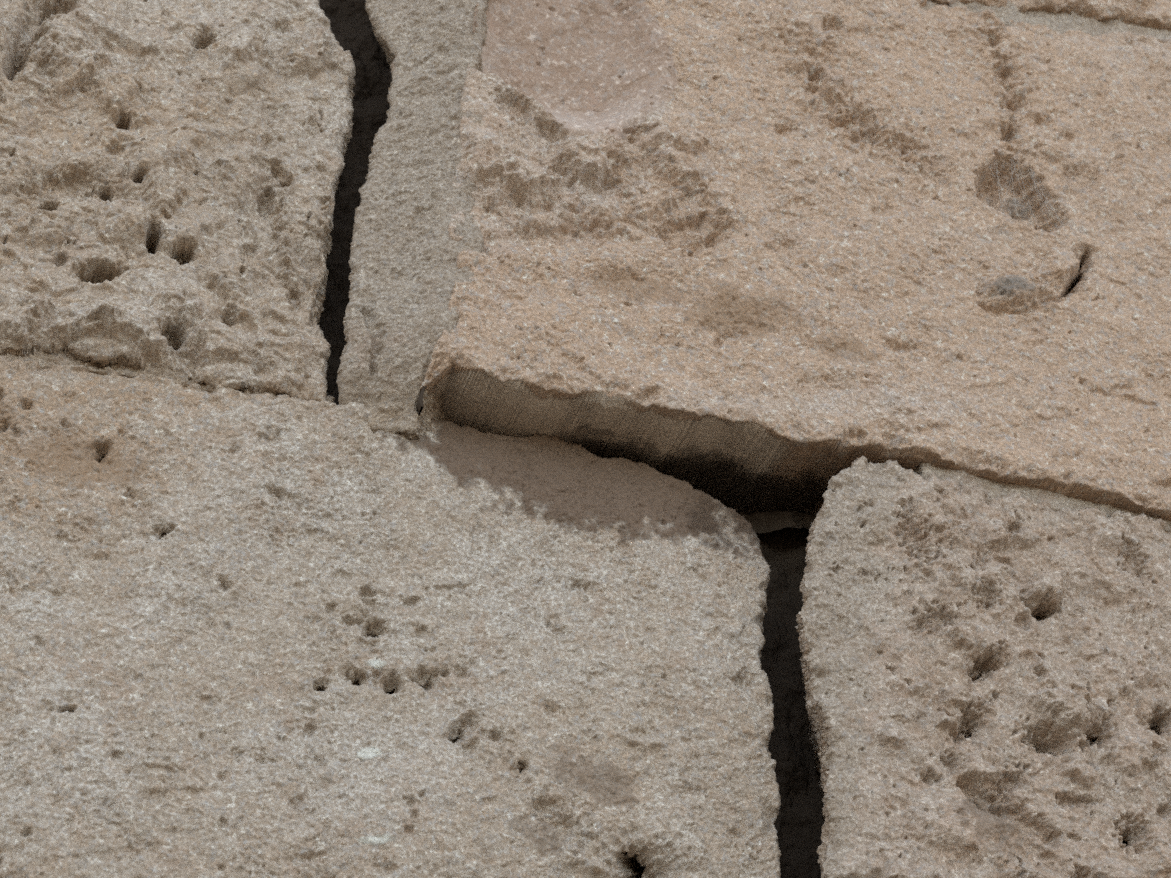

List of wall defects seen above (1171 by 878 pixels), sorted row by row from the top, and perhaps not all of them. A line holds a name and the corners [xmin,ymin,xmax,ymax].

crack [773,12,948,181]
crack [977,9,1028,159]
crack [319,0,392,405]
crack [1012,242,1101,318]
crack [416,385,427,415]
crack [738,510,824,878]
crack [865,866,891,878]